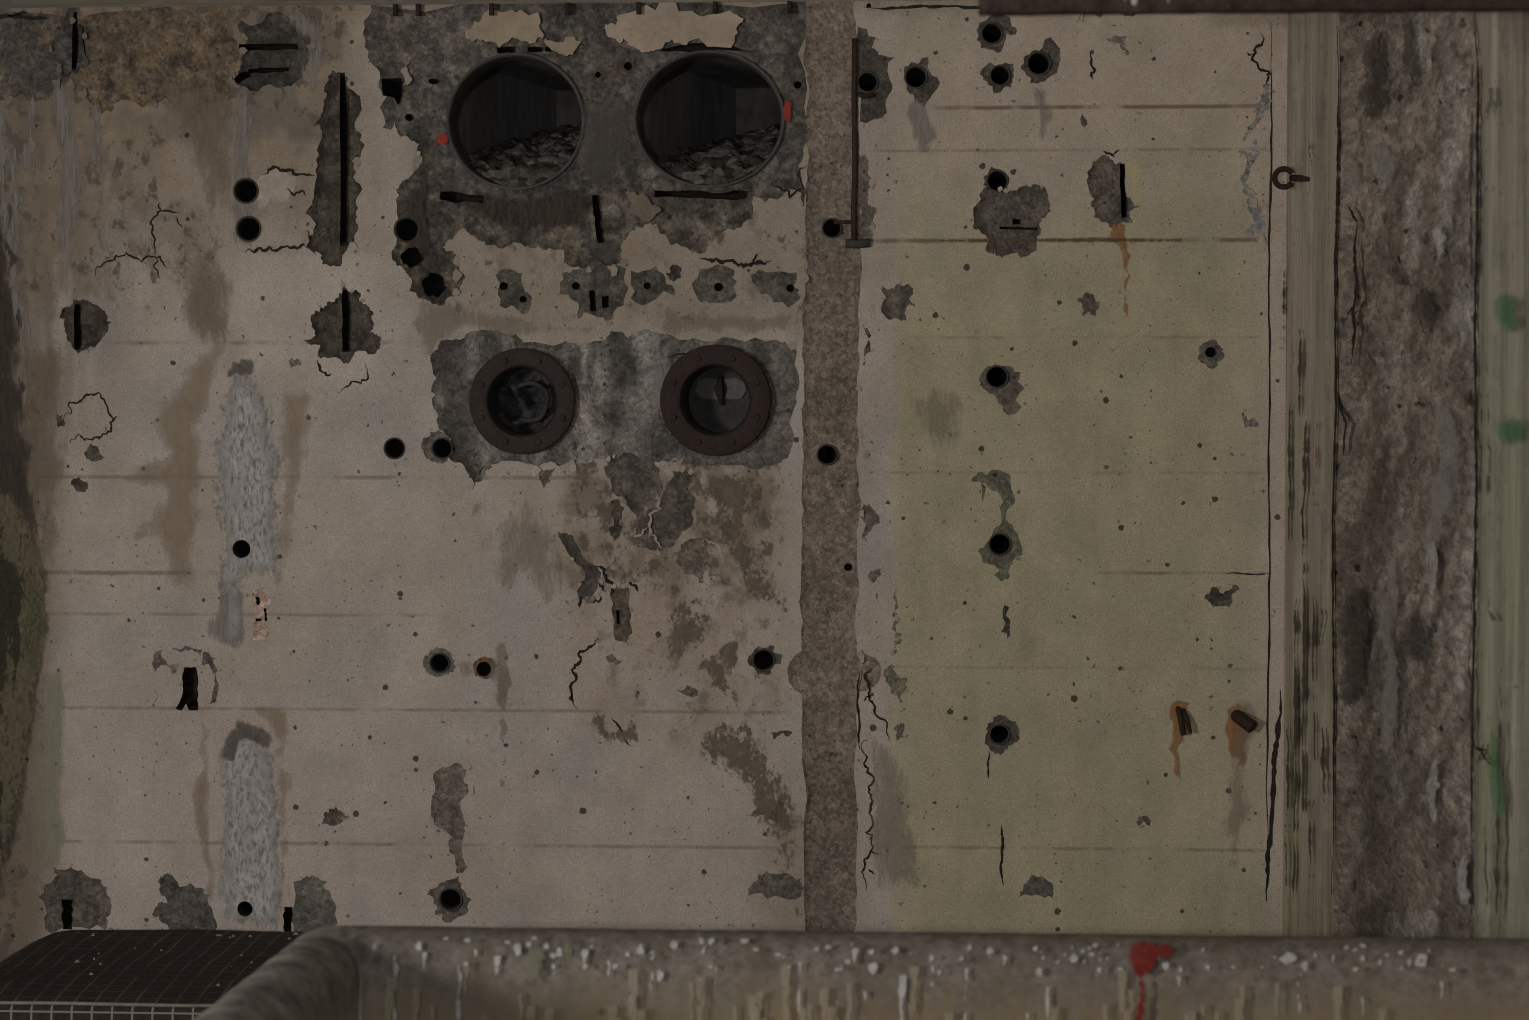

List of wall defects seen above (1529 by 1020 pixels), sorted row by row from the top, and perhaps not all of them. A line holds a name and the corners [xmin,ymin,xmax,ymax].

leakage [0,98,37,541]
flaking render [59,299,111,354]
crack [95,203,183,278]
flaking render [289,70,381,368]
flaking render [363,2,809,585]
flaking render [973,167,1051,258]
corrosion [941,223,1181,315]
crack [63,392,117,442]
leakage [8,593,38,704]
crack [569,566,638,746]
corrosion [1169,701,1190,777]
corrosion [1225,704,1249,765]